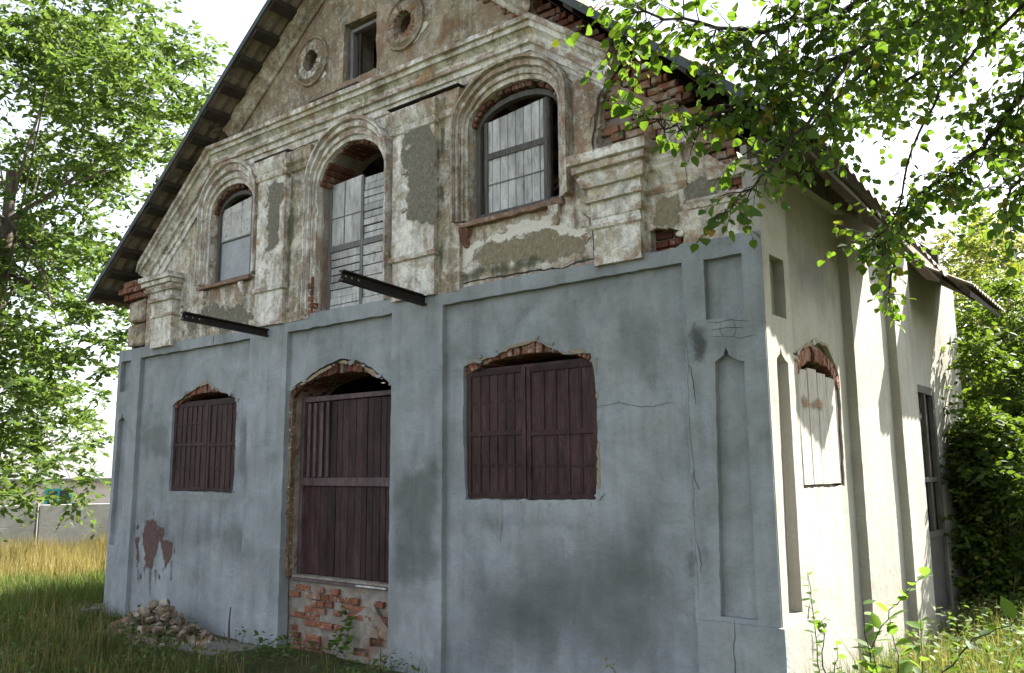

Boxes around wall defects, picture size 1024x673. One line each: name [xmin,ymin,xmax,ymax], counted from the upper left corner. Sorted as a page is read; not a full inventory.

flaking render [482,0,742,164]
flaking render [400,115,438,225]
flaking render [462,215,591,268]
flaking render [646,176,745,252]
flaking render [289,359,391,391]
flaking render [467,335,597,374]
leakage [693,330,705,357]
flaking render [594,441,604,500]
crack [602,319,755,582]